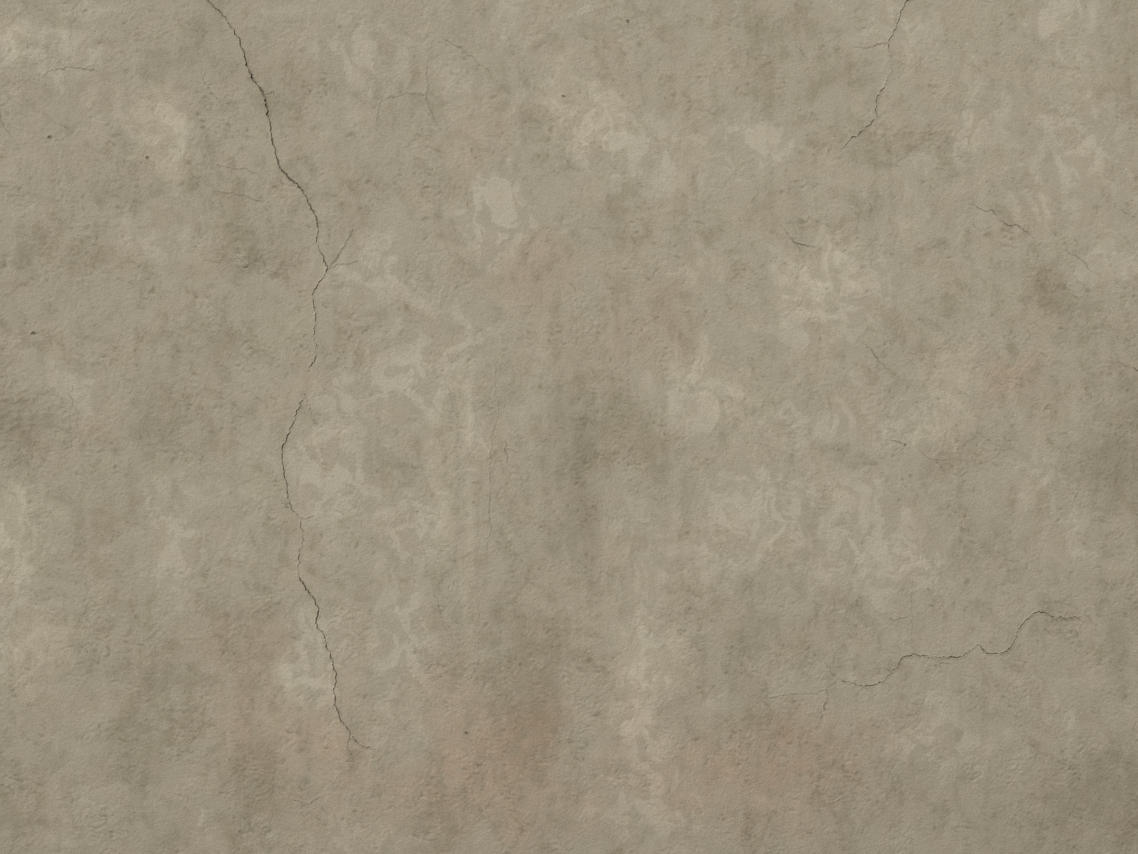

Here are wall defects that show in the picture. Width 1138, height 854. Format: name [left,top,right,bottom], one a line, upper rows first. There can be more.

crack [838,0,912,152]
crack [202,0,375,759]
crack [768,609,1082,738]